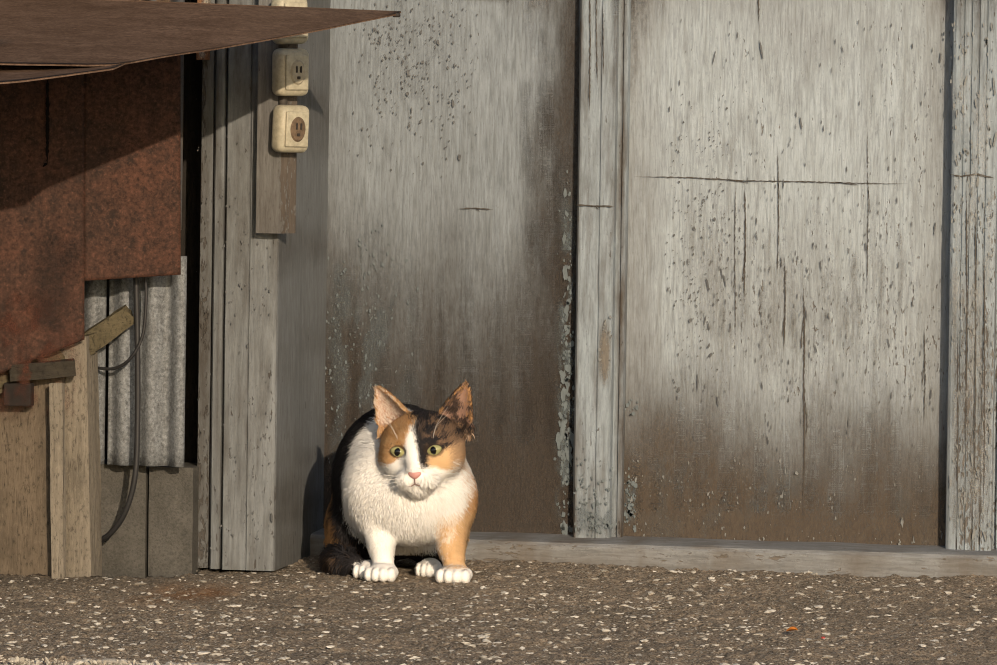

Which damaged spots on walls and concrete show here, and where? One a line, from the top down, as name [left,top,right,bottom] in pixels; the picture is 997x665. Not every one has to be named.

peeling [554,210,647,536]
peeling [665,135,830,411]
crack [636,133,905,504]
water stain [623,406,946,546]